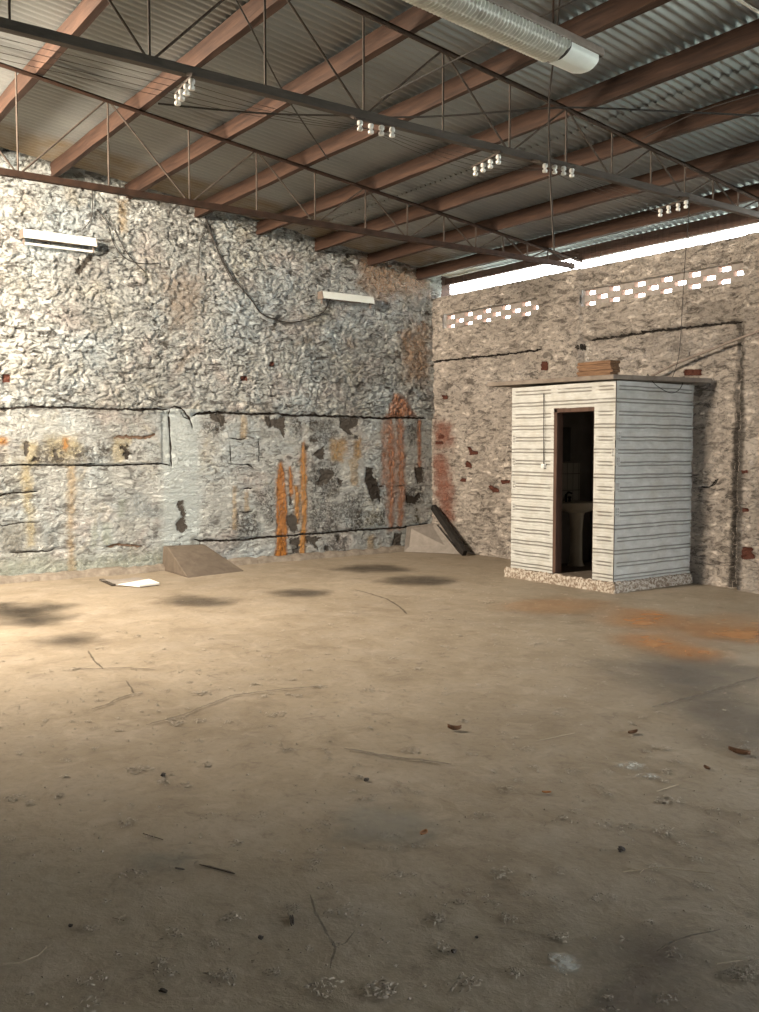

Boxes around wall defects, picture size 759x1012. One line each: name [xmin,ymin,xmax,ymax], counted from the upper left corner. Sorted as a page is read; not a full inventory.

flaking render [204,413,227,434]
crack [0,405,426,513]
crack [10,547,51,555]
crack [106,541,141,549]
flaking render [176,500,188,545]
peeling [236,489,275,535]
rust [275,442,307,556]
crack [194,523,427,544]
peeling [265,415,386,554]
flaking render [405,467,425,505]